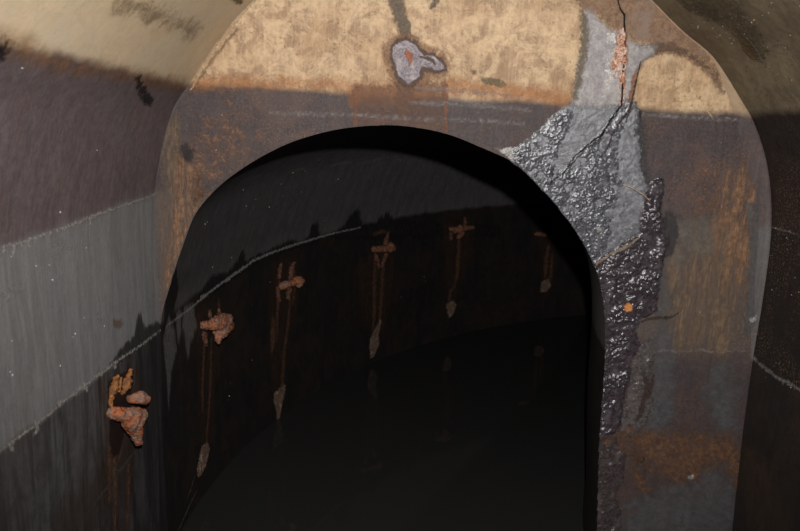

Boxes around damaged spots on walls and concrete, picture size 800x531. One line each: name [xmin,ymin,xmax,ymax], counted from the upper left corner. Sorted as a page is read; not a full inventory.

peeling [383,35,449,94]
crack [550,0,641,183]
rust [576,0,721,103]
rust [107,419,131,531]
rust [108,368,133,408]
rust [190,331,212,491]
rust [270,261,296,419]
rust [370,230,390,358]
spalling [510,98,668,531]